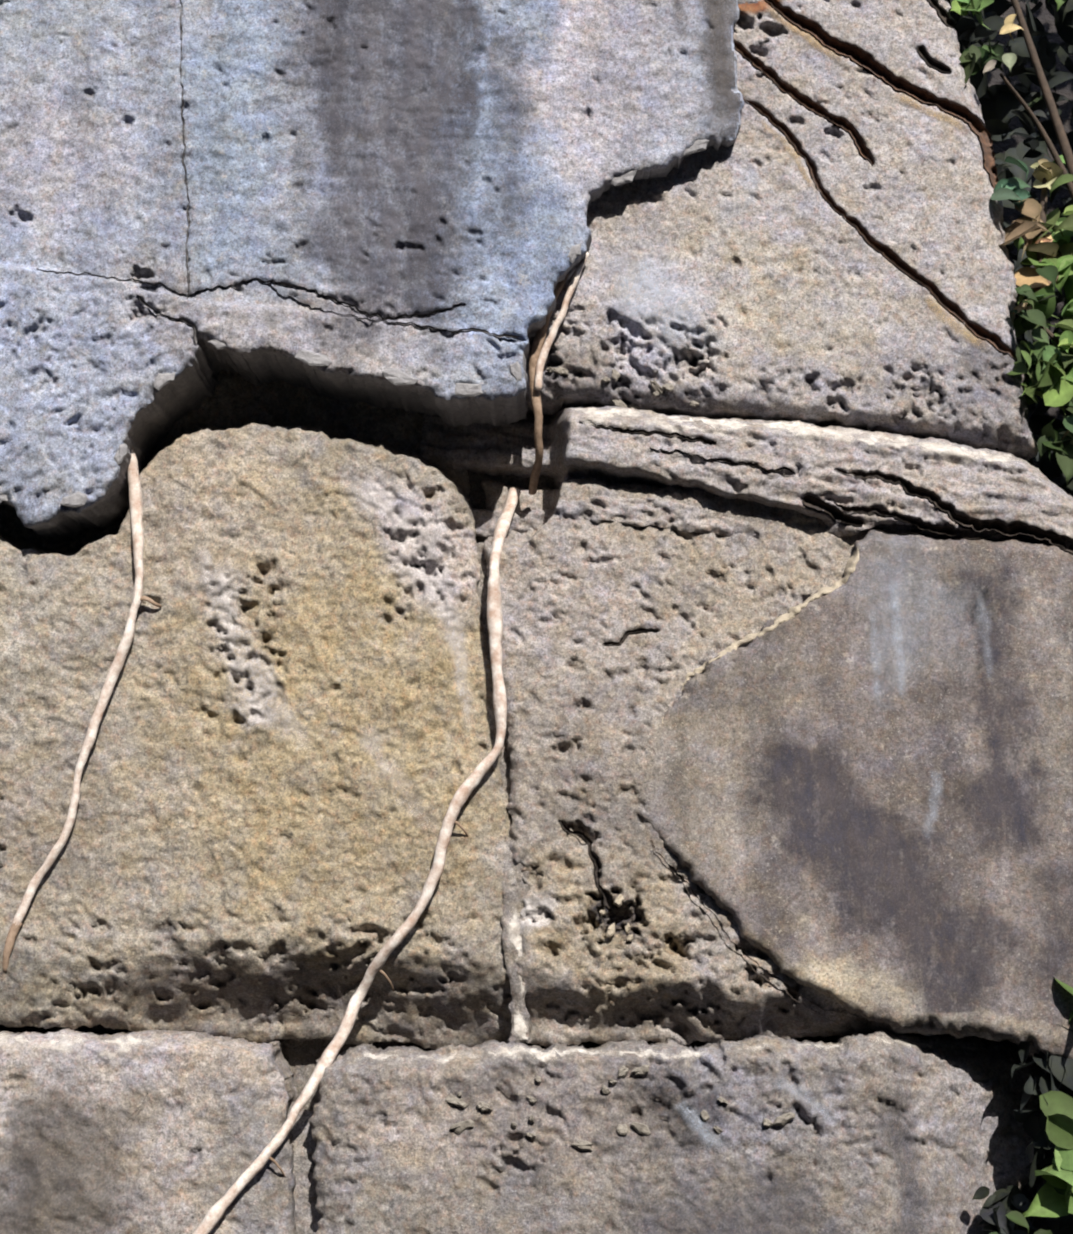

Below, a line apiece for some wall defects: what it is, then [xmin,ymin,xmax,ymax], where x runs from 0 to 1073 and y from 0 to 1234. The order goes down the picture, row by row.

crack [37,0,523,344]
damp [284,0,481,342]
crack [734,42,1018,361]
crack [766,0,998,188]
crack [580,420,1073,553]
crack [603,628,660,645]
damp [963,566,1041,846]
damp [756,744,1016,1013]